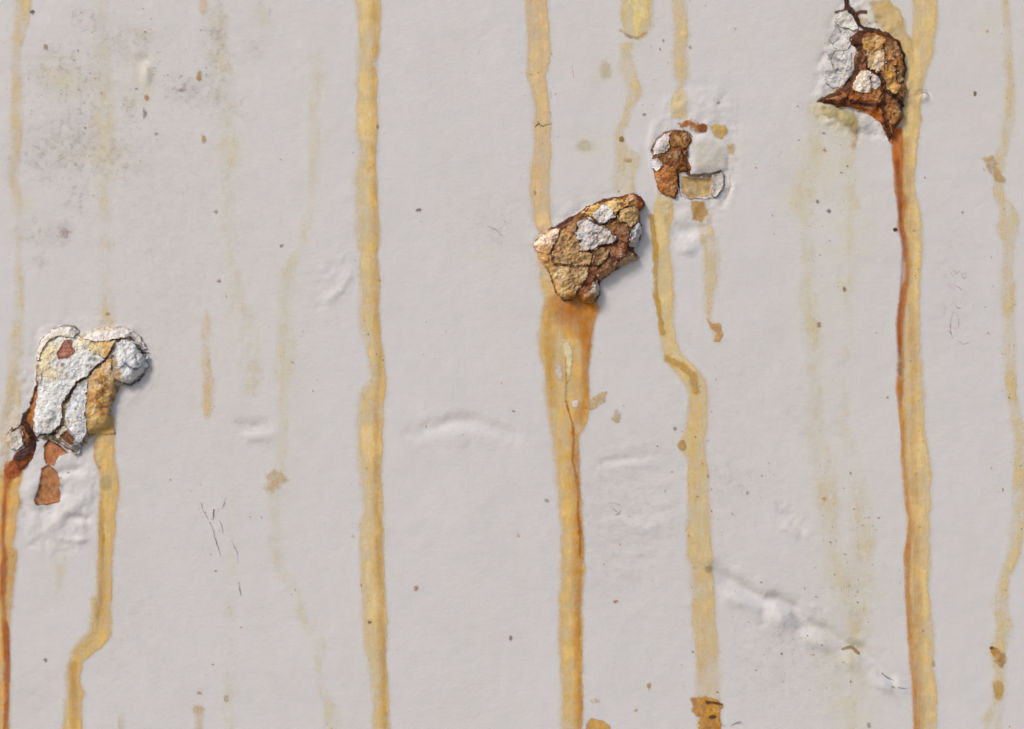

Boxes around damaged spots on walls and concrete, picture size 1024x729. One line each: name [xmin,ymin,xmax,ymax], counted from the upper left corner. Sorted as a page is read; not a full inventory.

peeling [523,81,745,316]
peeling [807,0,921,151]
peeling [0,313,161,558]
rust [526,0,610,729]
rust [892,0,937,729]
rust [0,464,22,729]